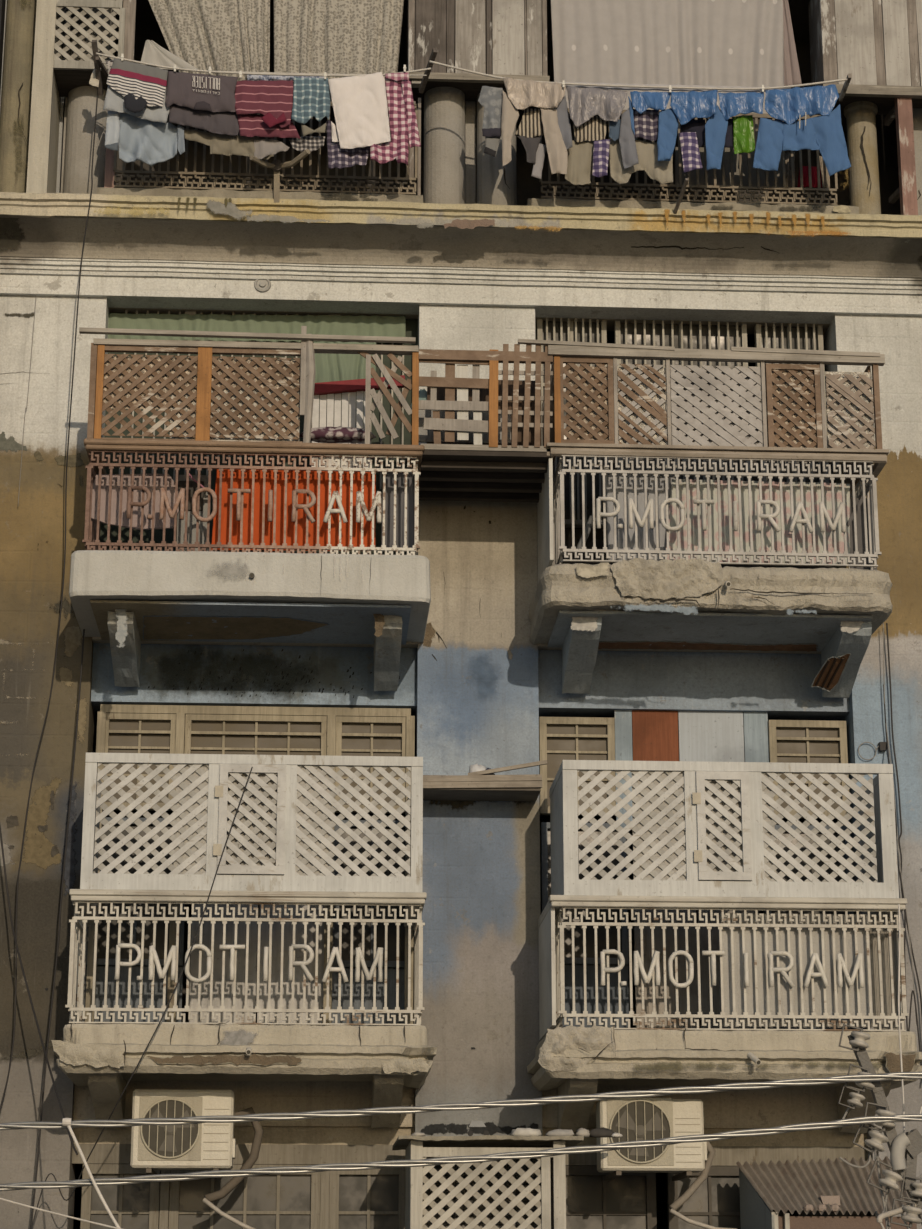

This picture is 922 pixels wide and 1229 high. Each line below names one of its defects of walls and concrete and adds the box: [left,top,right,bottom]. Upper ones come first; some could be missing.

crack [631,245,778,253]
peeling [0,432,84,486]
peeling [59,626,88,742]
leakage [147,649,363,698]
peeling [0,777,62,869]
spalling [51,1040,124,1068]
spalling [146,1053,302,1066]
spalling [382,1058,430,1074]
spalling [885,1052,916,1073]